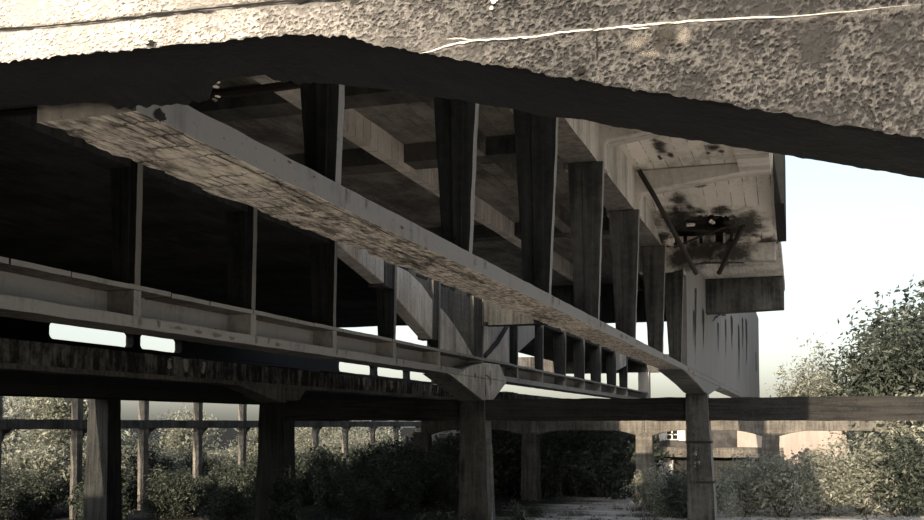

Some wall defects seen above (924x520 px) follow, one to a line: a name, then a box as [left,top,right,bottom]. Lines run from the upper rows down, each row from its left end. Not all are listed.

crack [423,4,920,59]
leakage [651,139,673,160]
leakage [654,195,777,273]